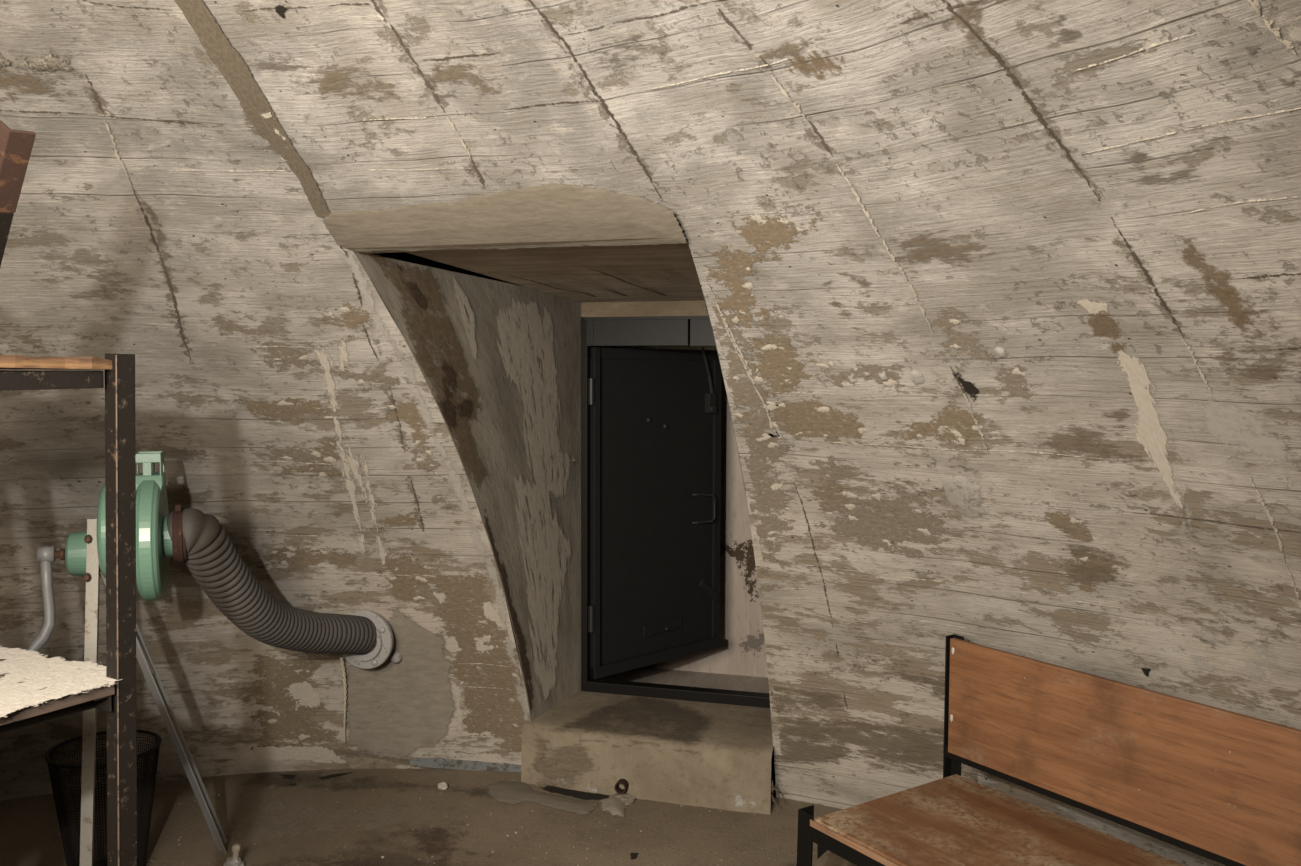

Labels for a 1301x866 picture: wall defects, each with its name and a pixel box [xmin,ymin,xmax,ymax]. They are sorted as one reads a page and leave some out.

crack [889,0,983,28]
crack [503,100,598,110]
crack [470,156,484,186]
crack [1111,217,1184,338]